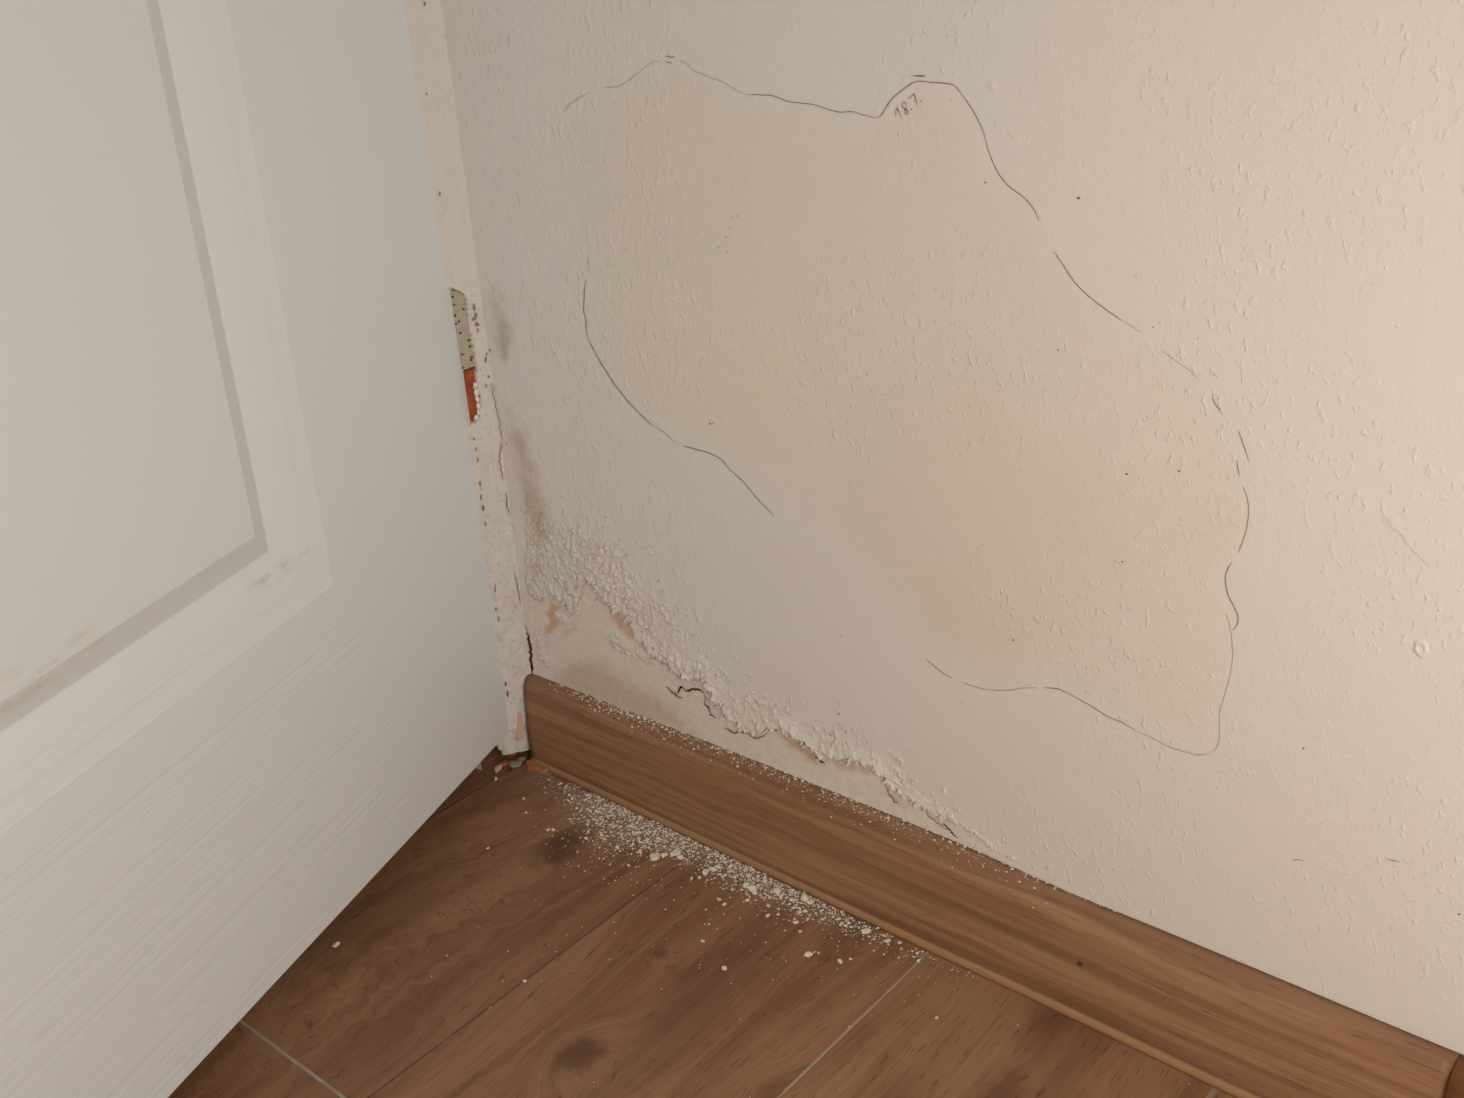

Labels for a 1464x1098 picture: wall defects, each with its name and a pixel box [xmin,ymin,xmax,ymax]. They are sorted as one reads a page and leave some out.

flaking render [526,584,975,846]
water stain [541,40,1264,757]